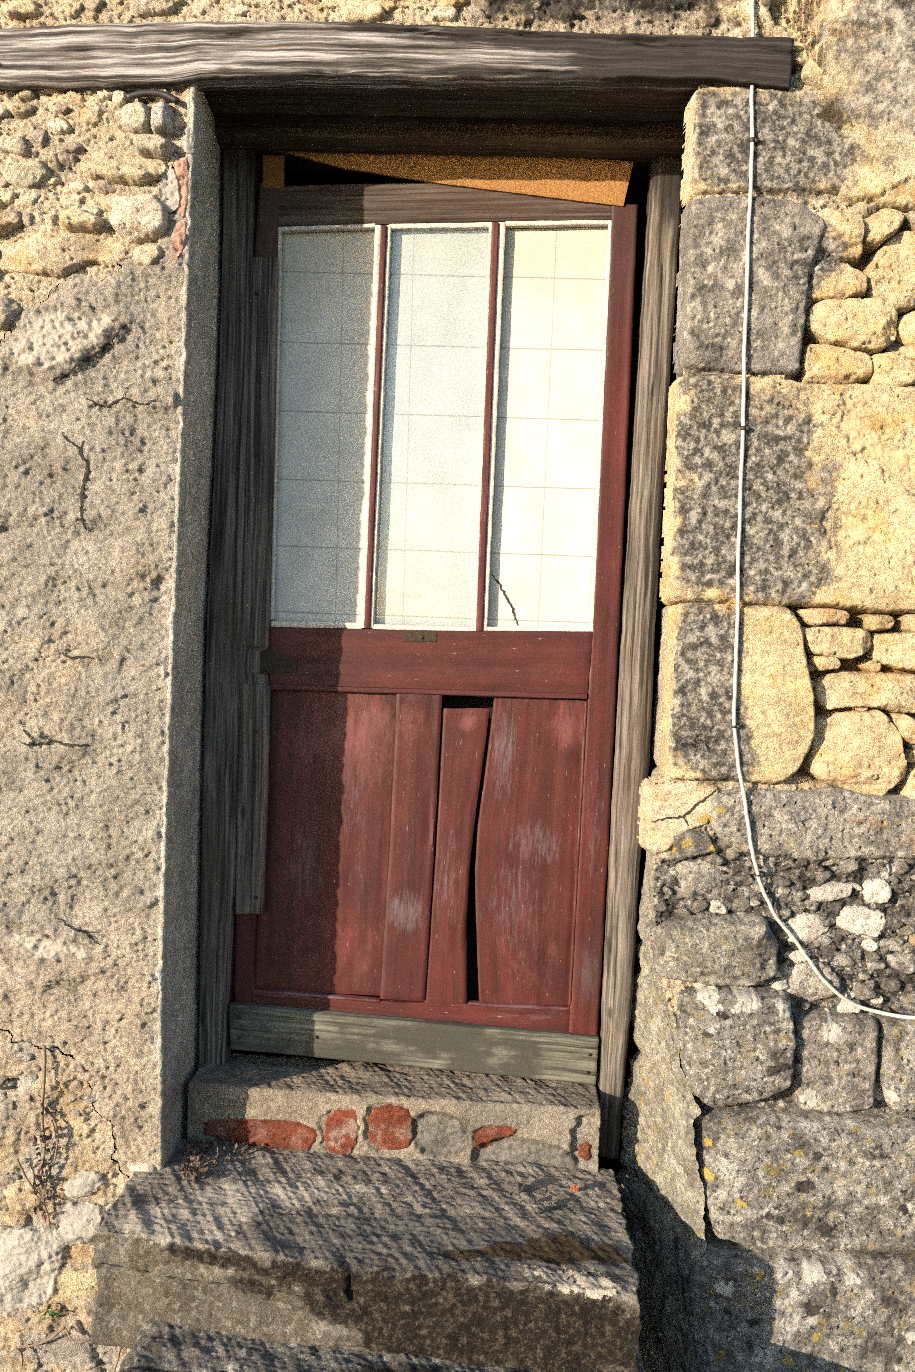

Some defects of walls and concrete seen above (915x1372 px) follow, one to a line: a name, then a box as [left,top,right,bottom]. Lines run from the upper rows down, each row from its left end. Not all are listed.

crack [50,325,158,408]
crack [61,431,89,530]
crack [651,789,717,825]
peeling [0,1170,105,1317]